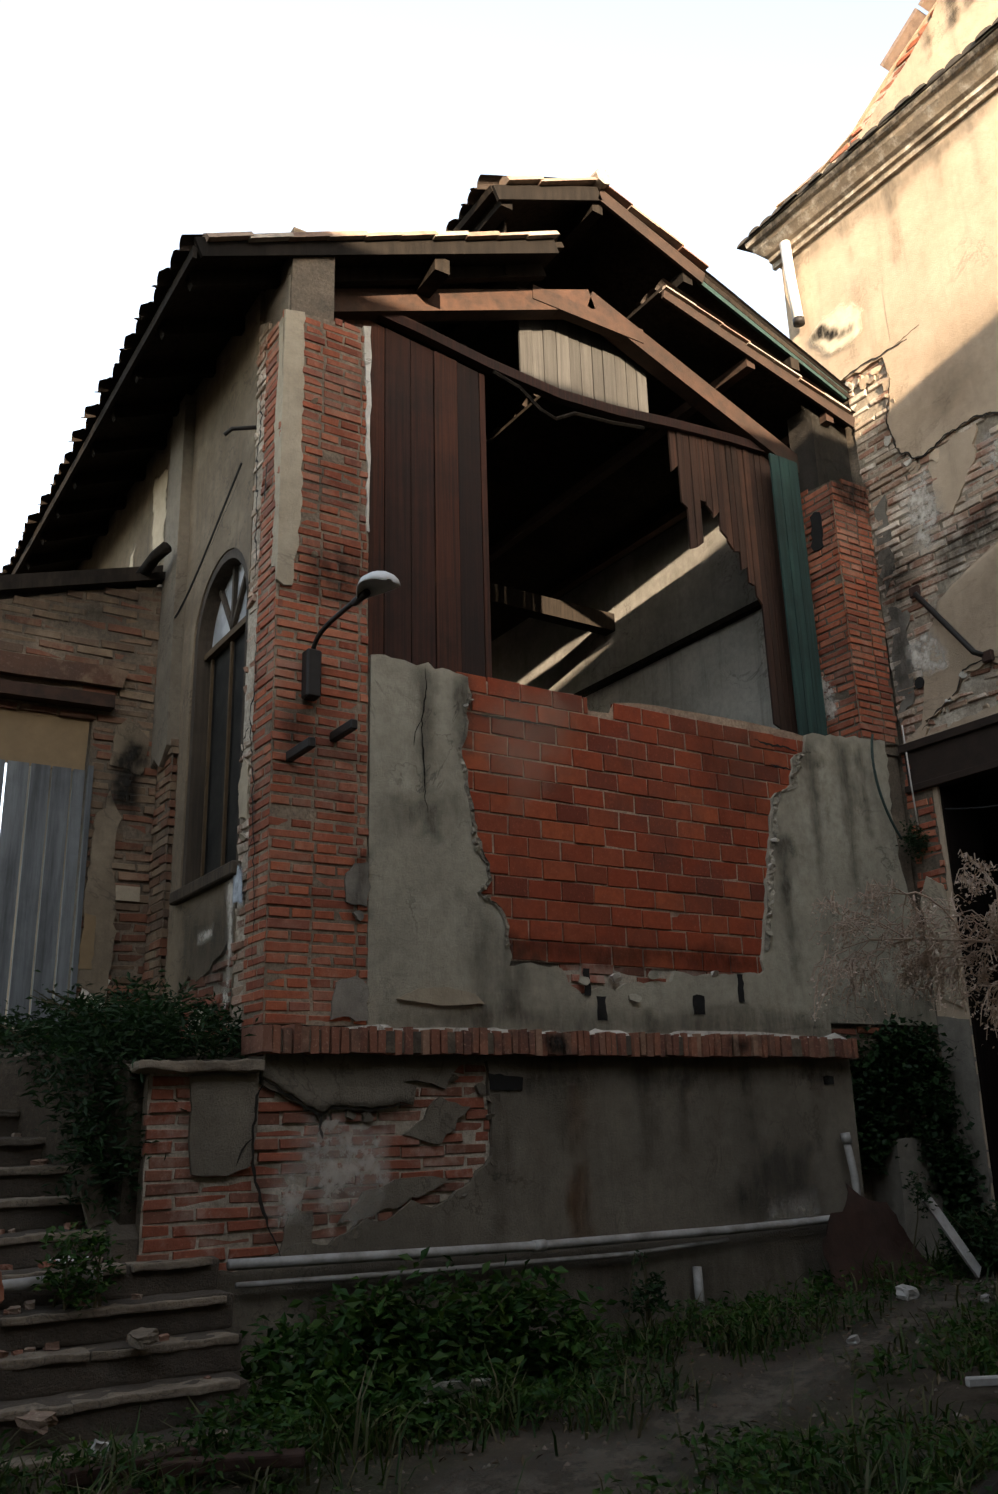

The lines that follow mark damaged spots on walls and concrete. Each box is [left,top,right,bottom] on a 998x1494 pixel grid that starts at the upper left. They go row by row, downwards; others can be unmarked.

leakage [756,29,998,241]
crack [844,325,998,459]
spalling [845,358,998,896]
leakage [111,741,143,806]
spalling [456,693,510,947]
spalling [764,751,811,950]
spalling [136,1061,500,1271]
crack [236,1058,417,1256]